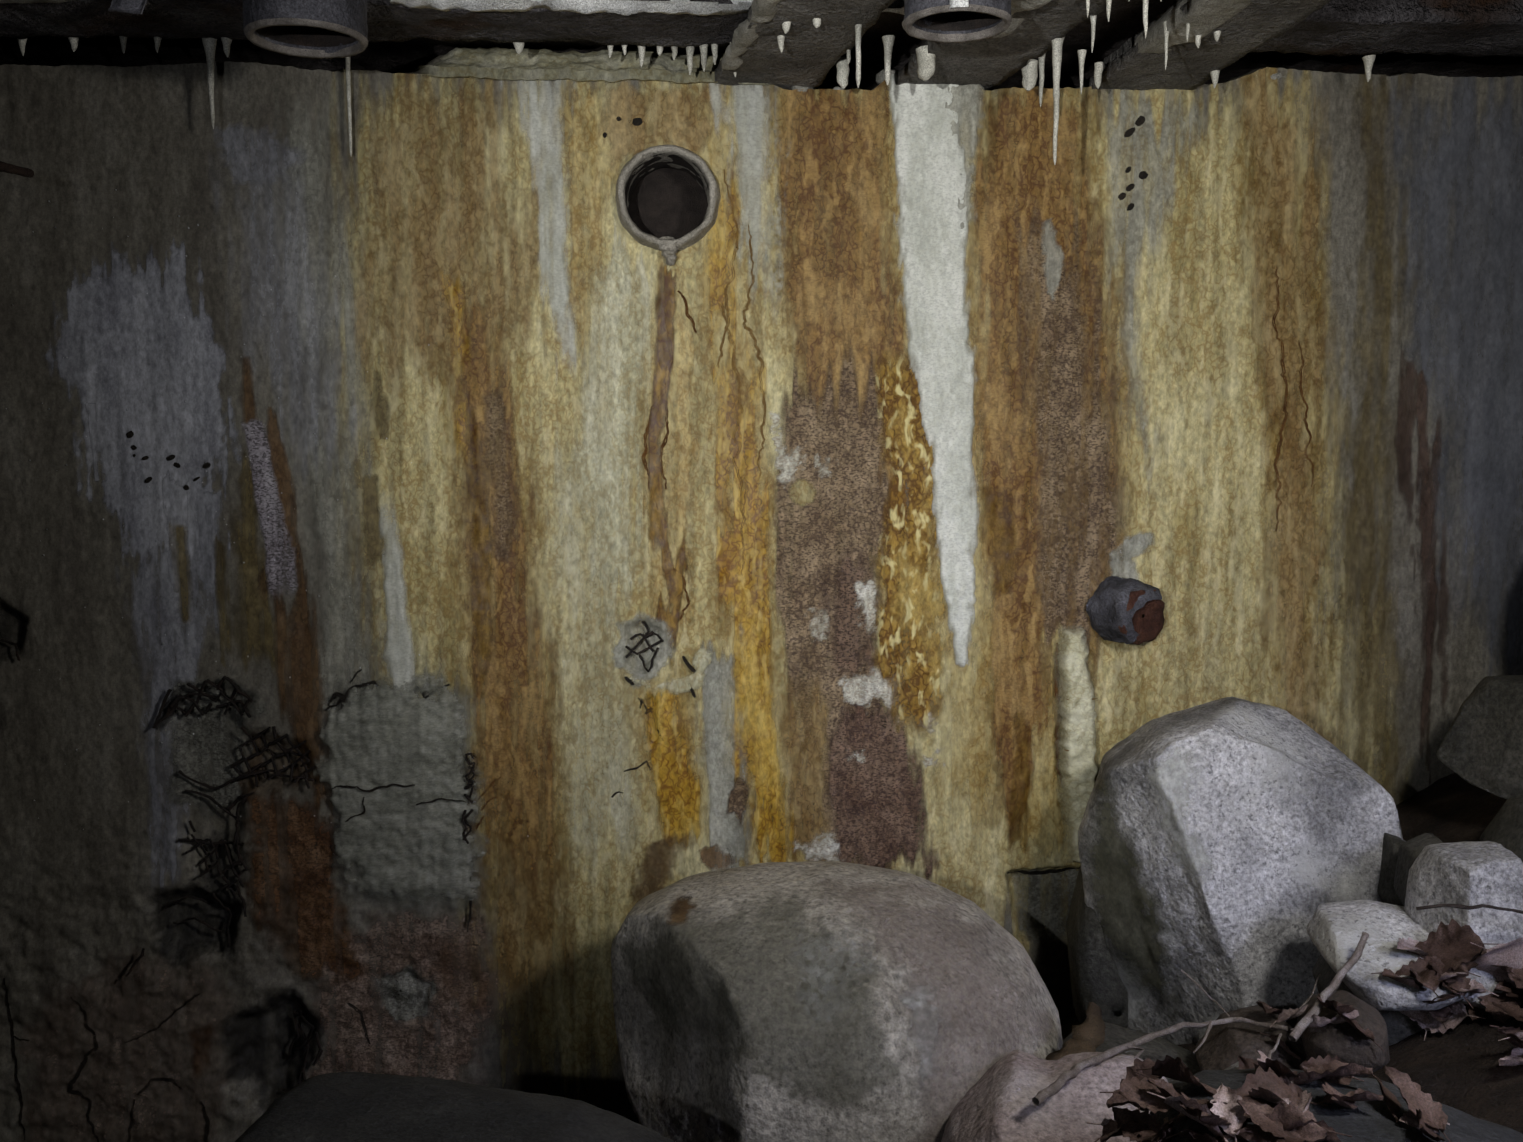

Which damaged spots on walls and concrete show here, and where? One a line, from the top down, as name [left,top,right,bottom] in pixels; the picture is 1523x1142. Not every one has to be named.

water stain [950,0,969,8]
water stain [993,0,1051,38]
spalling [152,675,316,948]
crack [325,669,450,711]
corrosion [357,79,564,886]
water stain [339,0,829,1100]
spalling [613,612,711,698]
corrosion [565,79,939,880]
water stain [882,73,1081,951]
corrosion [969,86,1129,860]
water stain [1061,70,1284,780]
water stain [1302,332,1391,786]